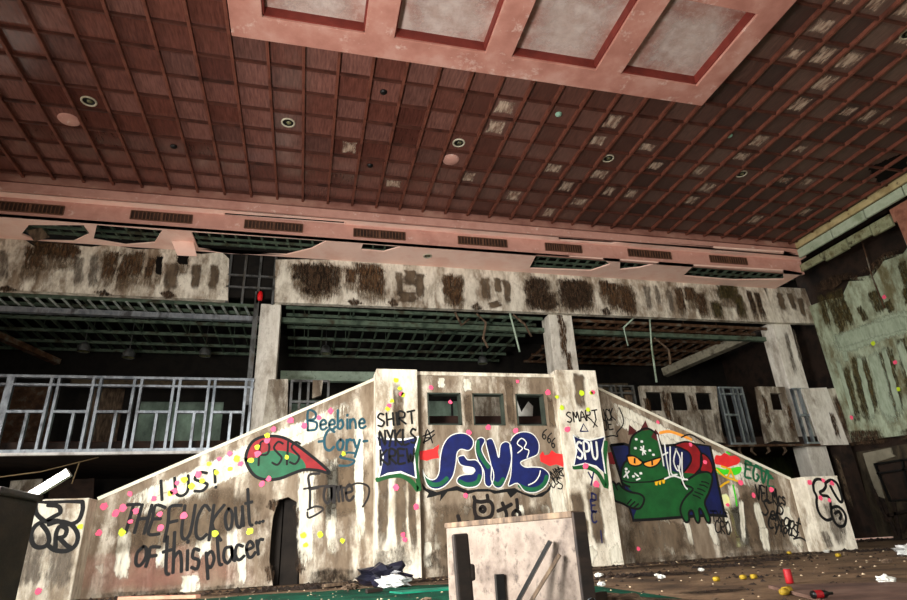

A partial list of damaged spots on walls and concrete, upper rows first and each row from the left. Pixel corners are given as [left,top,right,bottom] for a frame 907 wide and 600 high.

damp [155,254,219,290]
damp [288,261,342,300]
damp [395,270,425,302]
damp [523,277,594,312]
damp [573,374,585,408]
damp [836,338,907,422]
damp [270,405,348,446]
damp [133,442,250,515]
damp [293,459,338,574]
damp [354,420,365,541]
damp [378,472,440,567]
damp [546,480,605,543]